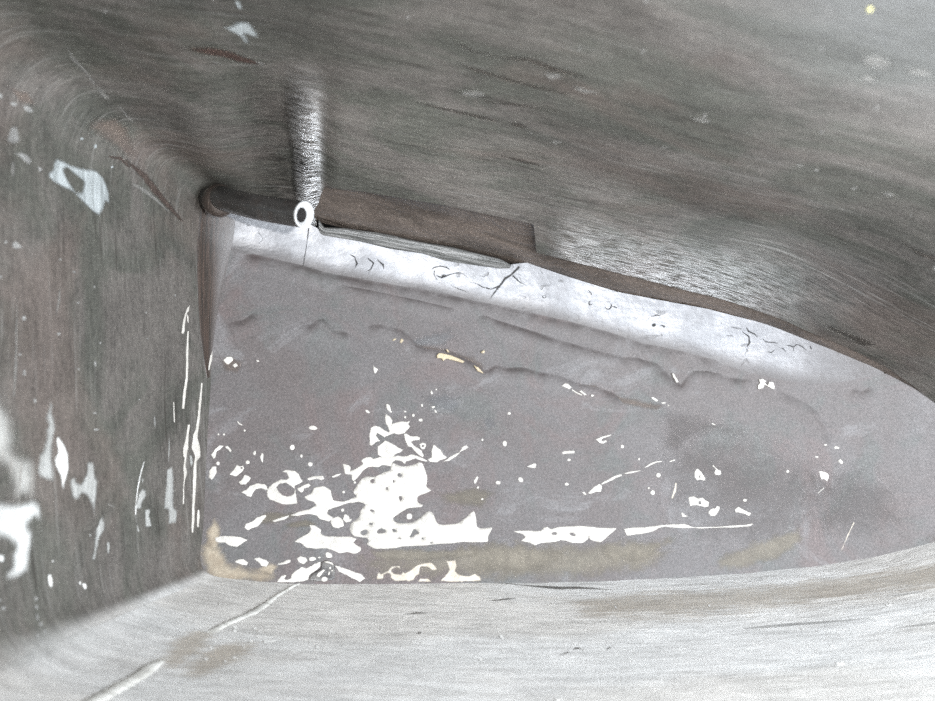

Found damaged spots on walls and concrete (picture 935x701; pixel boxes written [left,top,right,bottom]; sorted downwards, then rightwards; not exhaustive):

corrosion [196,48,257,63]
peeling [20,154,109,213]
crack [432,266,546,298]
peeling [173,305,190,422]
crack [734,327,812,353]
peeling [0,407,96,576]
peeling [165,383,203,533]
peeling [209,446,231,480]
peeling [215,404,492,583]
peeling [514,496,753,545]
peeling [695,465,721,481]
corrosion [204,523,276,581]